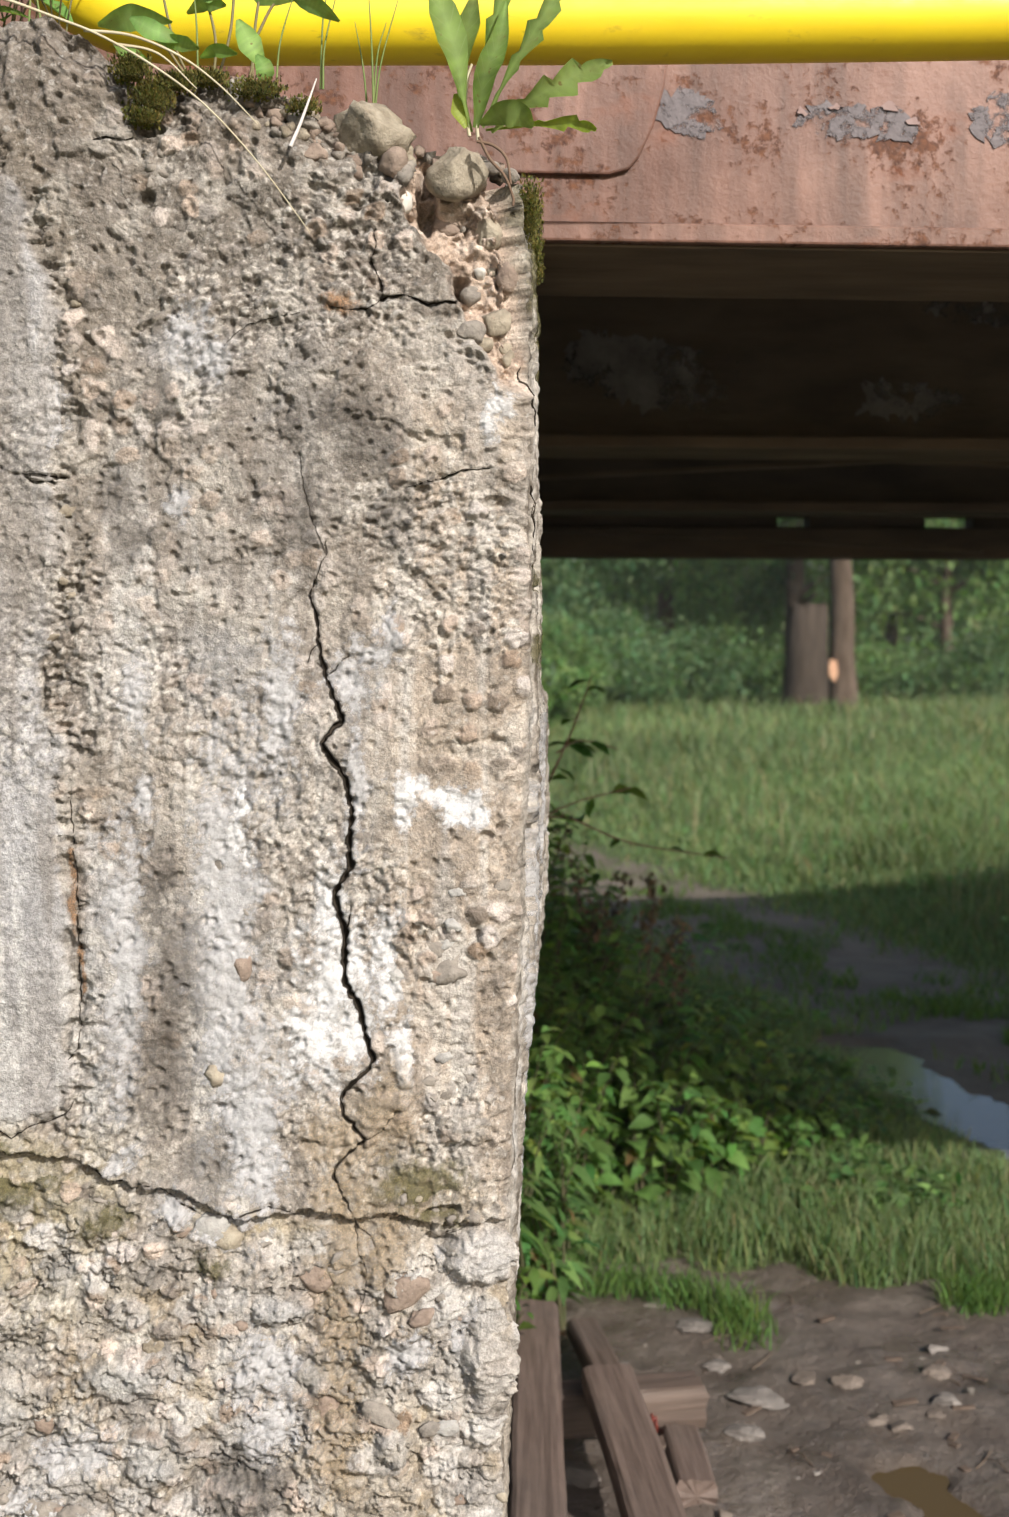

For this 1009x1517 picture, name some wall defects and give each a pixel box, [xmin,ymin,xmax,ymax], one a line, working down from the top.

peeling [655,88,724,139]
peeling [792,99,922,144]
peeling [968,91,1009,149]
crack [204,233,456,370]
crack [408,468,490,487]
crack [69,800,83,1059]
crack [300,456,396,1355]
crack [0,1101,74,1139]